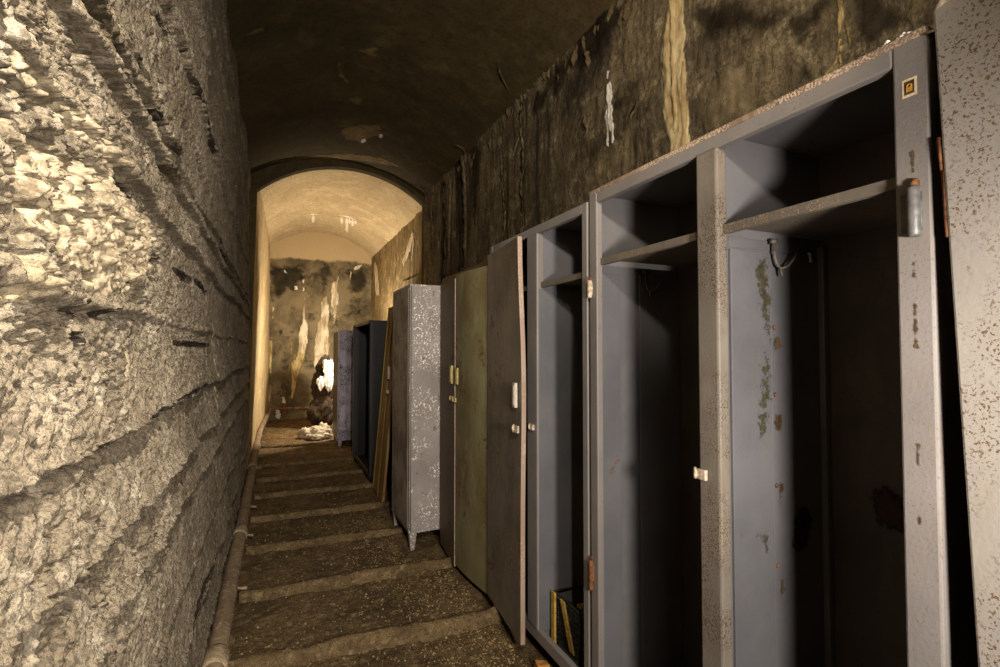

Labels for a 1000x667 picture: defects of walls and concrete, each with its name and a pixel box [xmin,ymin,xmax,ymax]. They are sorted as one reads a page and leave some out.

leakage [605,71,614,146]
leakage [661,0,690,151]
leakage [268,262,379,402]